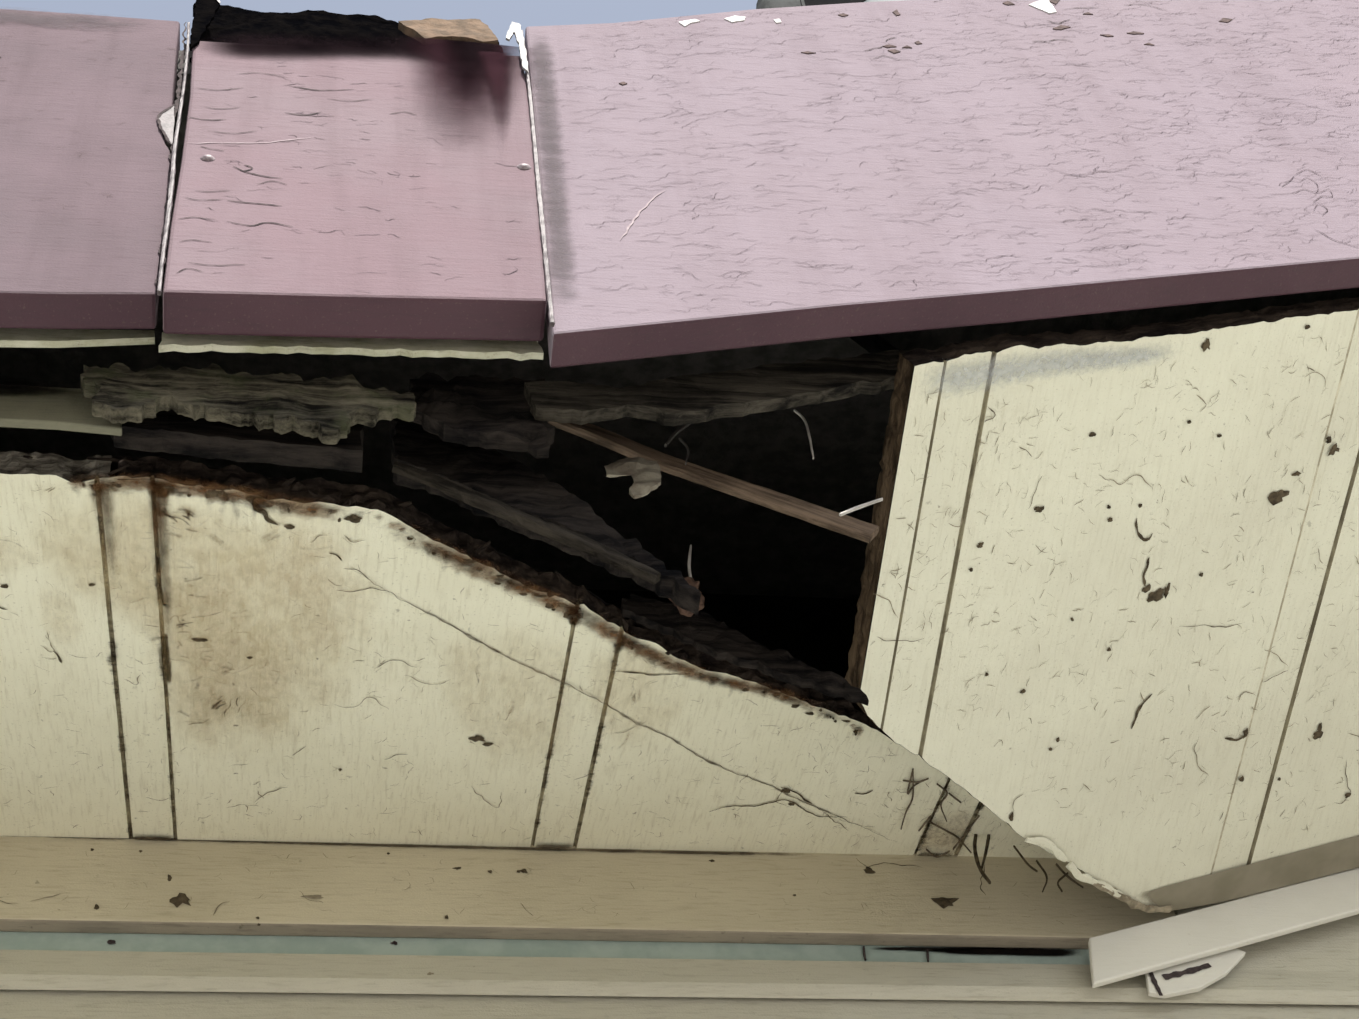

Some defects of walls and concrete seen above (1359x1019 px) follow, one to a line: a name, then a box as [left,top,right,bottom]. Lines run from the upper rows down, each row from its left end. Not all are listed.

leakage [72,476,862,736]
leakage [468,735,494,746]
crack [0,337,1359,924]
peeling [1024,837,1173,913]